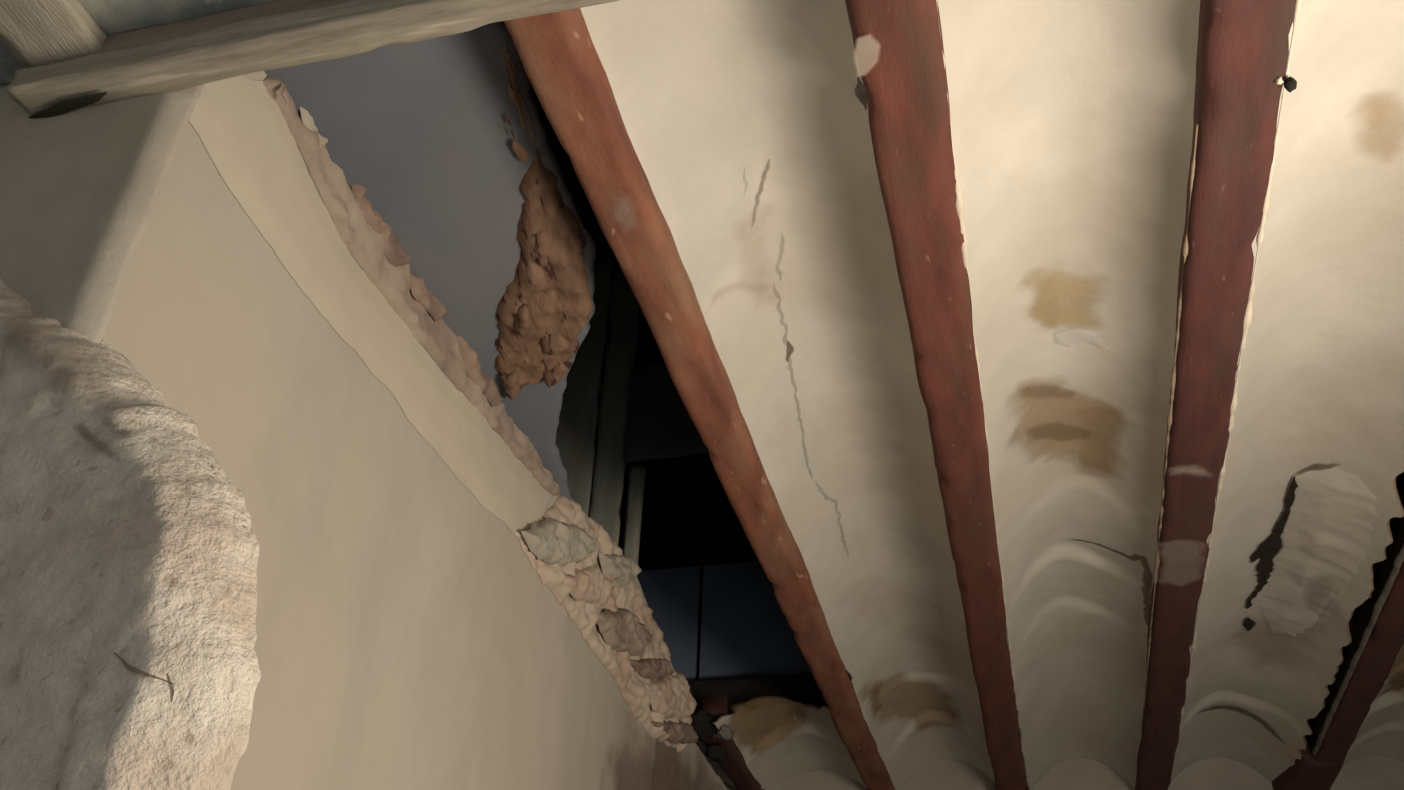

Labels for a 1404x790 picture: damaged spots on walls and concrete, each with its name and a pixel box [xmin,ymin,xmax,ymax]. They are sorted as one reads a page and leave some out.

crack [786,341,794,362]
spalling [263,49,699,753]
leakage [1017,388,1119,471]
crack [1069,539,1152,625]
crack [1197,465,1404,750]
leakage [730,698,806,752]
leakage [865,677,956,728]